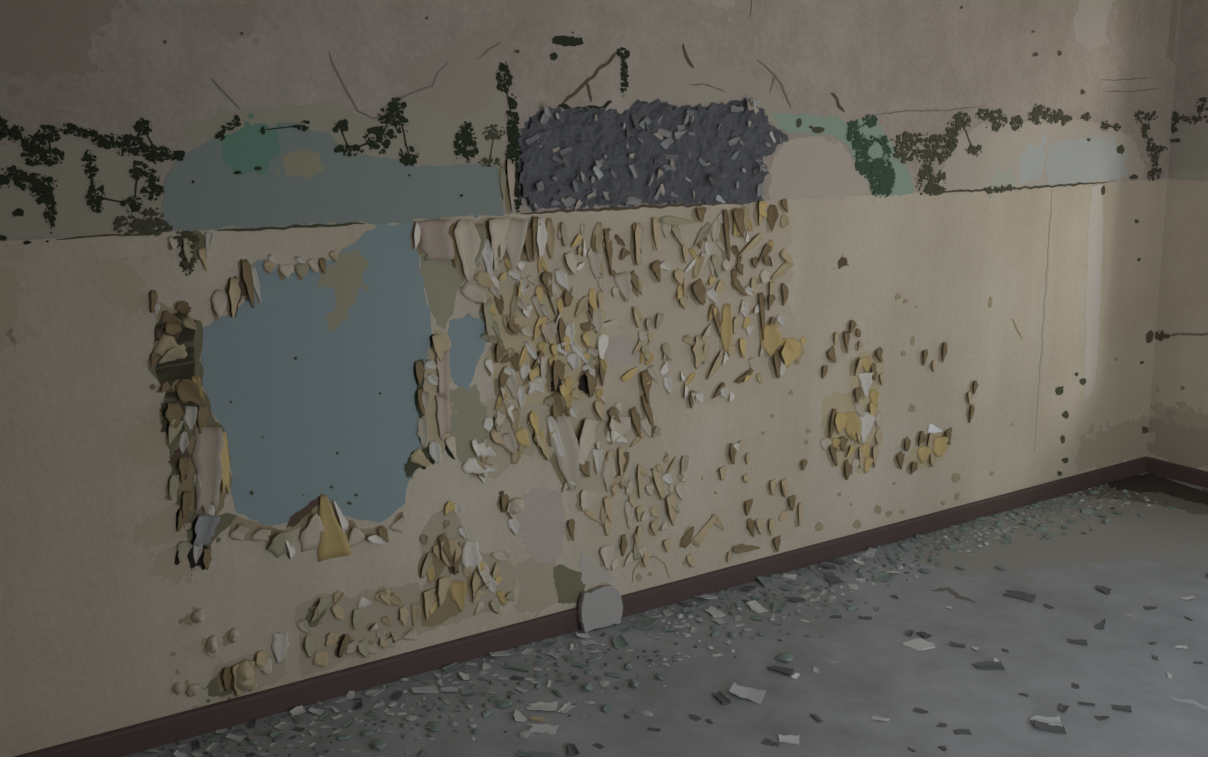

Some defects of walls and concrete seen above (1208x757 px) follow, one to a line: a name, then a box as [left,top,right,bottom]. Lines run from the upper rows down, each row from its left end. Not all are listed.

water stain [332,29,506,177]
water stain [215,115,241,141]
water stain [259,120,310,135]
water stain [796,118,825,133]
water stain [1171,111,1189,133]
mould [845,114,896,198]
peeling [0,47,1146,581]
peeling [211,501,558,700]
peeling [903,630,935,650]
peeling [972,658,1005,670]
peeling [712,682,766,705]
peeling [1030,715,1066,734]